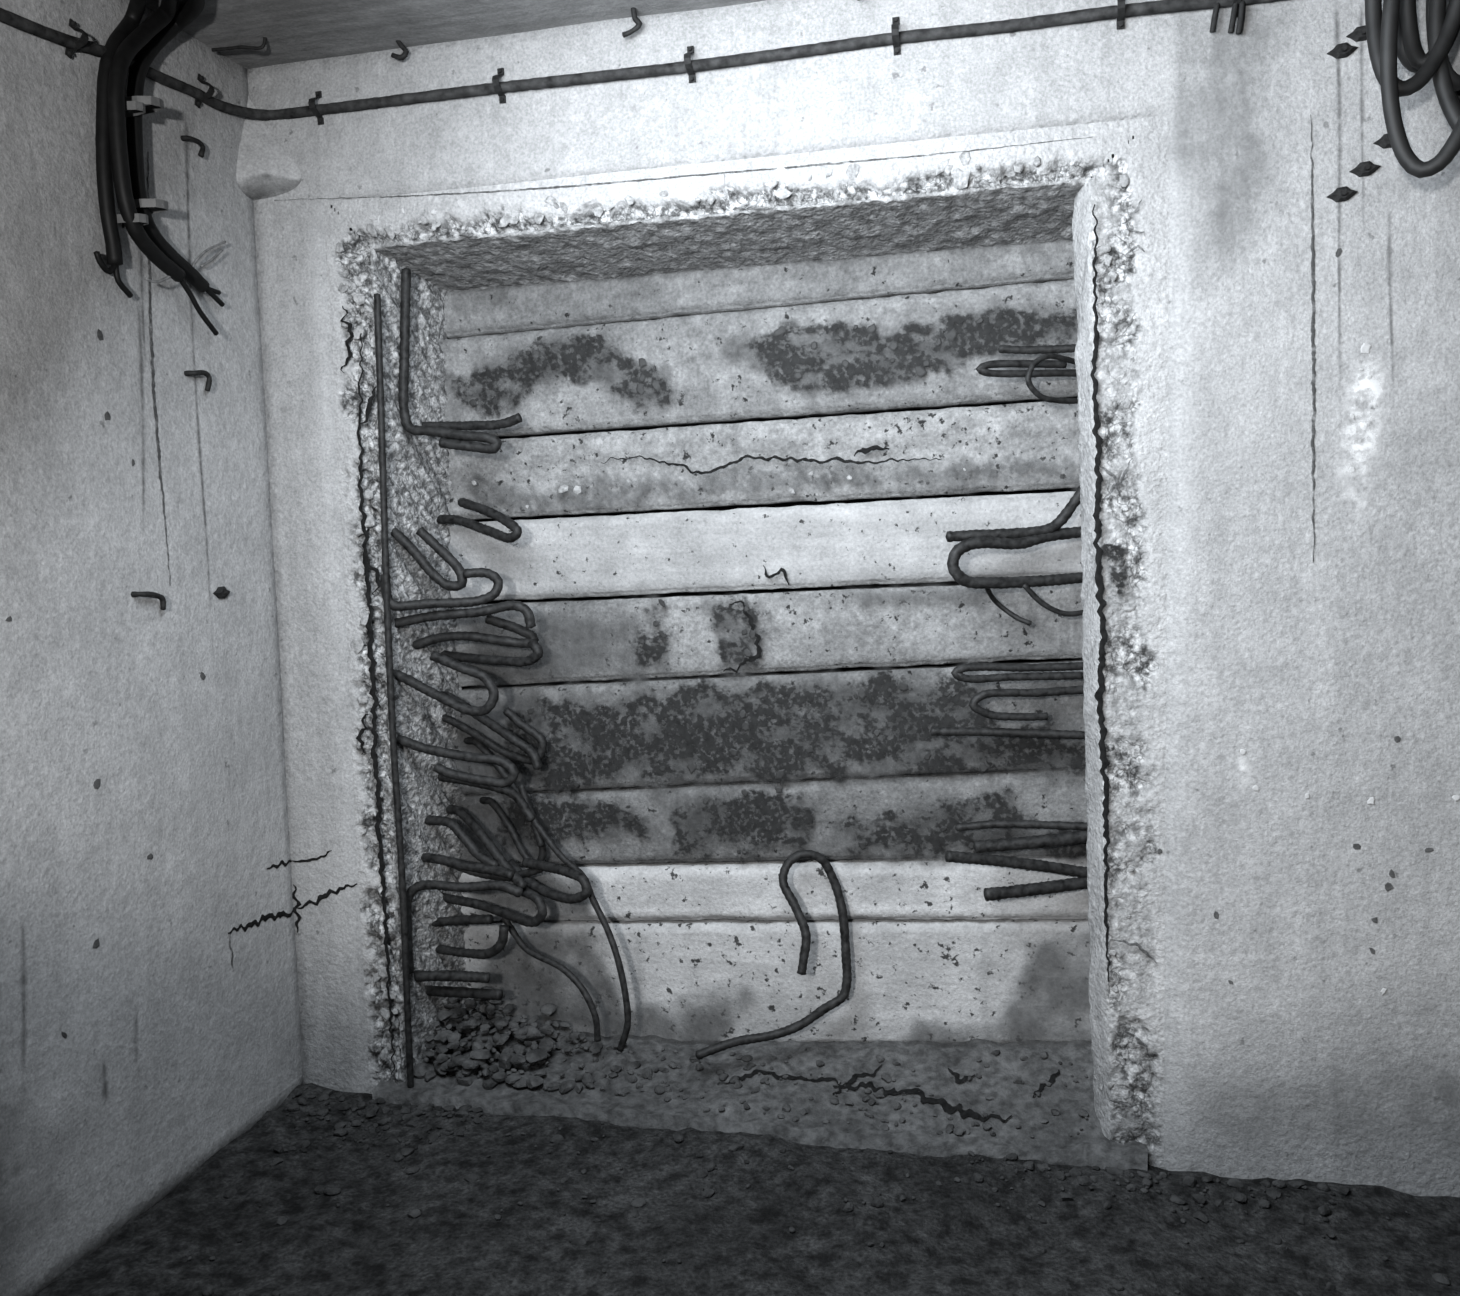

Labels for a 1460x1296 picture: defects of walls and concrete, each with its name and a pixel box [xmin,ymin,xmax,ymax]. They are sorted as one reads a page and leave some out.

crack [601,445,941,475]
water stain [474,615,601,683]
spalling [323,115,1170,1169]
crack [228,306,396,1075]
crack [717,1064,1060,1122]